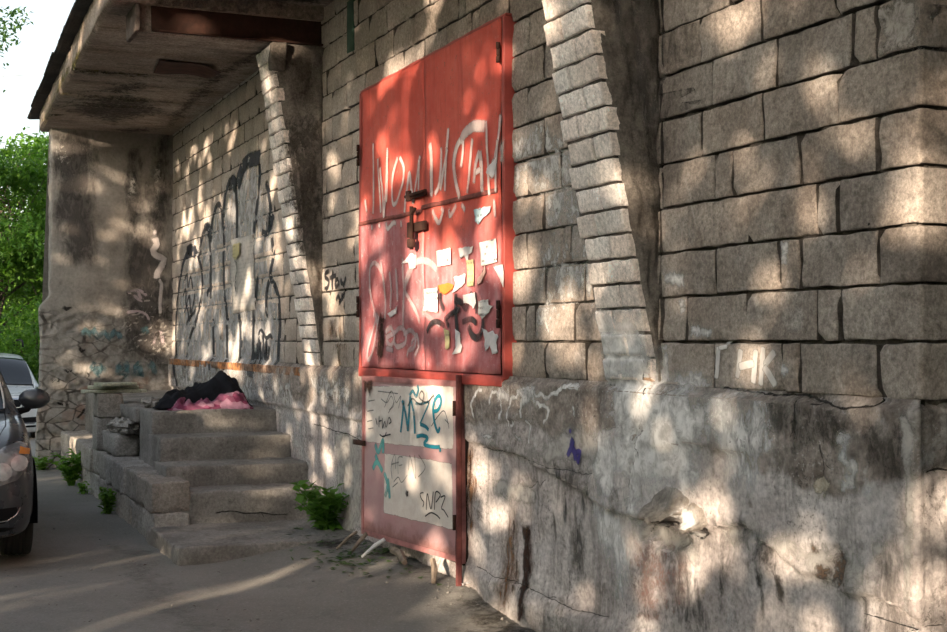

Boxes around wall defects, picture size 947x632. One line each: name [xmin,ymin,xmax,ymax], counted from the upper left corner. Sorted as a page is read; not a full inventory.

damp [67,79,161,133]
damp [513,126,591,331]
damp [665,272,683,285]
damp [470,383,580,444]
crack [724,386,885,438]
damp [553,314,901,590]
corrosion [498,518,531,621]
crack [477,566,608,617]
damp [754,541,784,610]